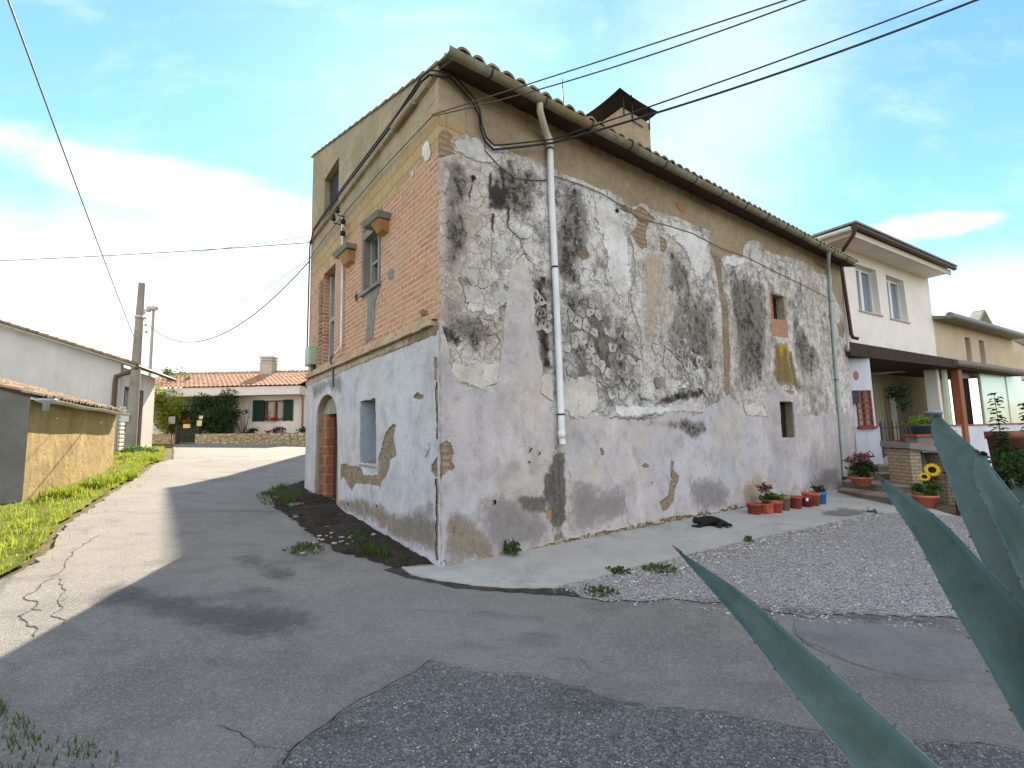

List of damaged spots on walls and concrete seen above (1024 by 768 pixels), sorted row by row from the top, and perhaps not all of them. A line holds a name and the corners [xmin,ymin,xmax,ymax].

leakage [445,164,473,272]
crack [463,227,533,355]
leakage [488,161,717,404]
crack [562,234,664,421]
peeling [458,188,811,419]
crack [671,351,724,406]
mould [730,271,767,390]
spalling [340,424,397,490]
spalling [432,440,454,478]
leakage [340,446,624,565]
spalling [660,461,679,512]
crack [18,535,100,637]